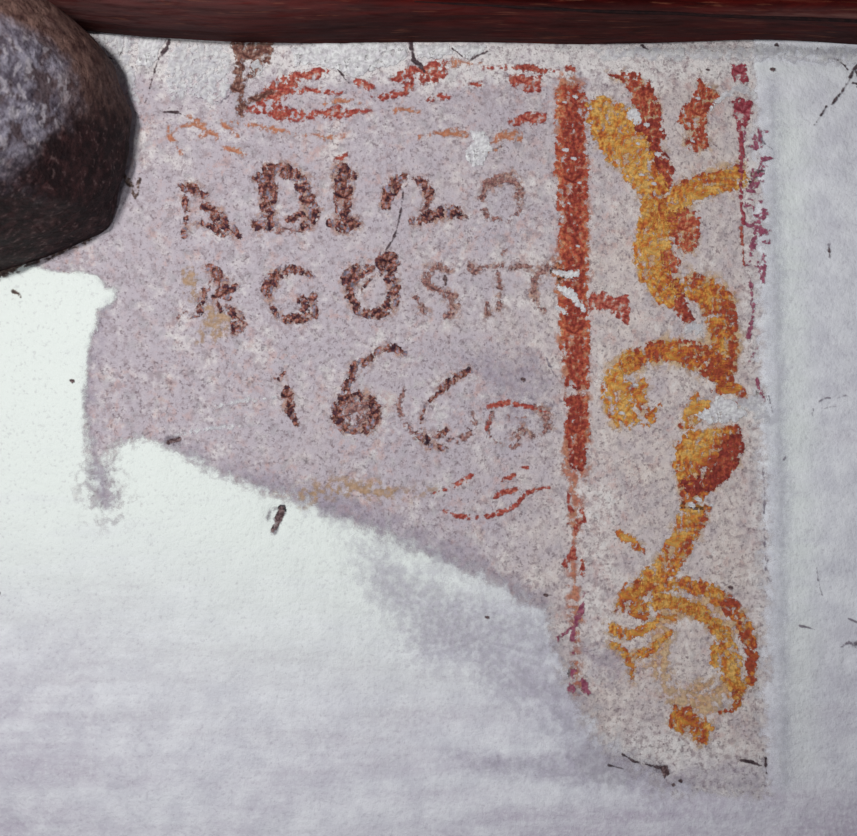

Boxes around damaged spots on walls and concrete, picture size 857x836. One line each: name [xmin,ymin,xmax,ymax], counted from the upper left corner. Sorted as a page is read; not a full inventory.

crack [817,48,857,116]